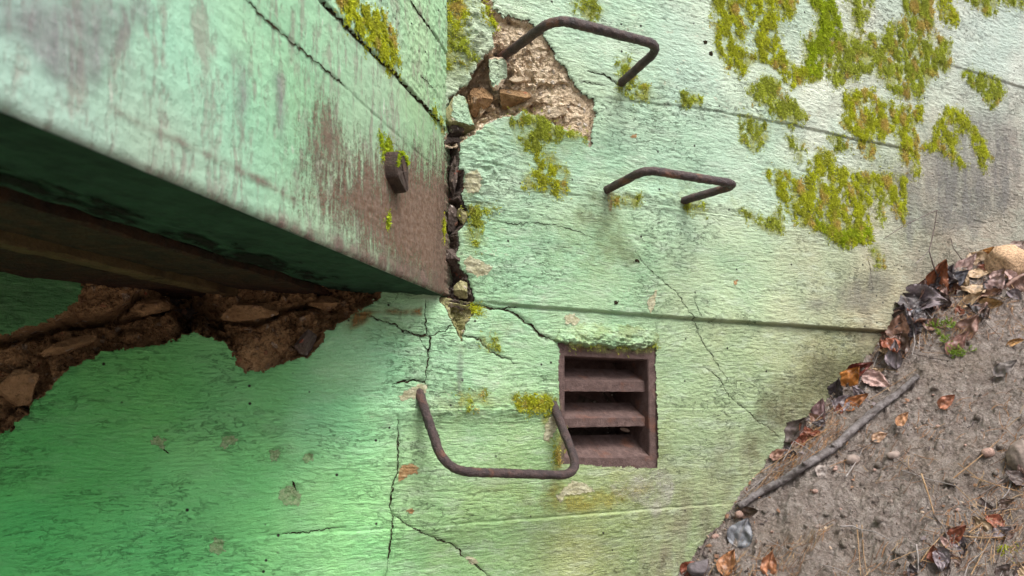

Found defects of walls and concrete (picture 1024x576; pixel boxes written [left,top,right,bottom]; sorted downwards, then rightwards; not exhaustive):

corrosion [267,87,453,297]
spalling [439,0,596,341]
spalling [0,283,382,435]
crack [369,300,554,385]
crack [638,255,779,437]
crack [385,419,487,576]